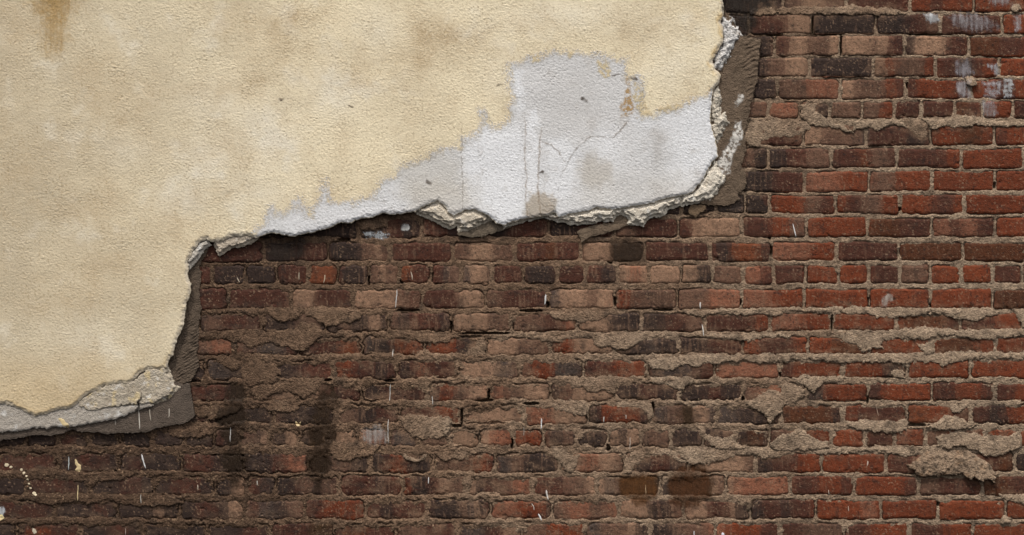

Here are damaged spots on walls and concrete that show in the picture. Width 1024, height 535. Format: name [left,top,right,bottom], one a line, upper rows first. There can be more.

flaking render [713,16,743,70]
peeling [188,49,730,270]